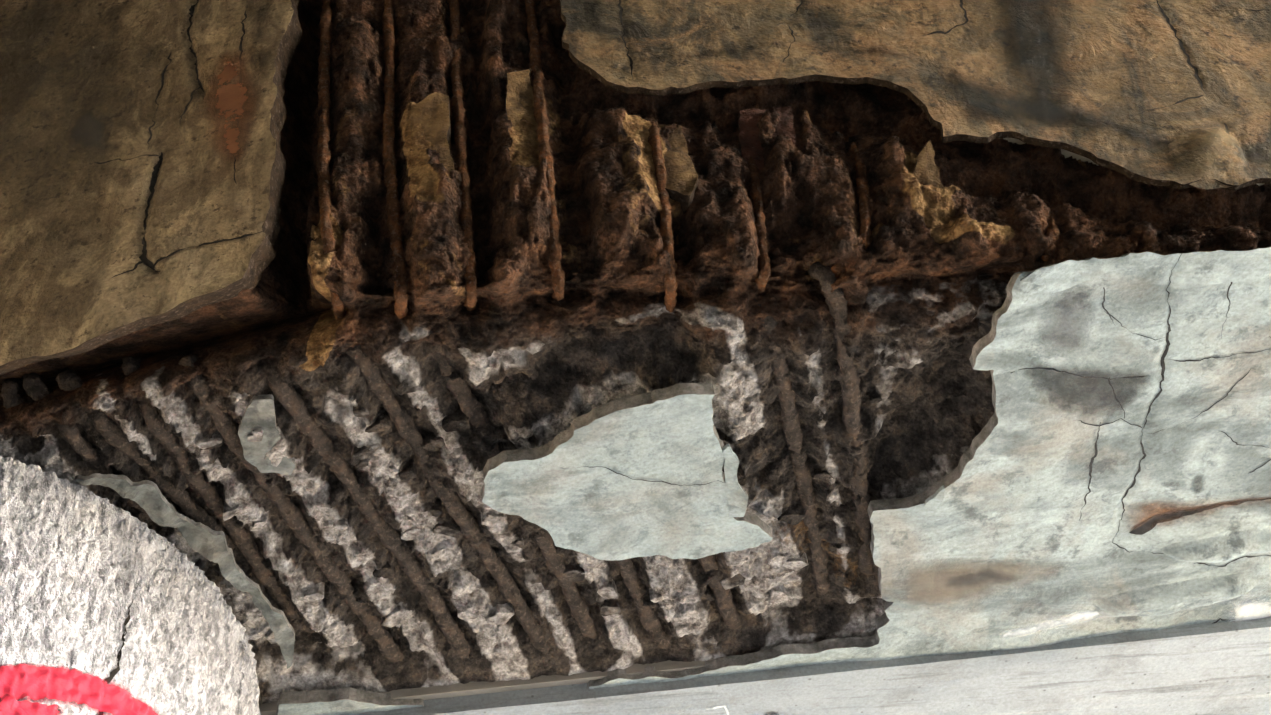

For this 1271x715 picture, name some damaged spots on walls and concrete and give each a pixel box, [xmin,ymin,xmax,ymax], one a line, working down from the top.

crack [104,0,264,279]
spalling [0,0,993,704]
crack [996,367,1068,376]
spalling [864,83,1271,464]
crack [1126,0,1207,117]
rust [1140,506,1194,522]
crack [1079,254,1271,554]
crack [1194,555,1271,567]